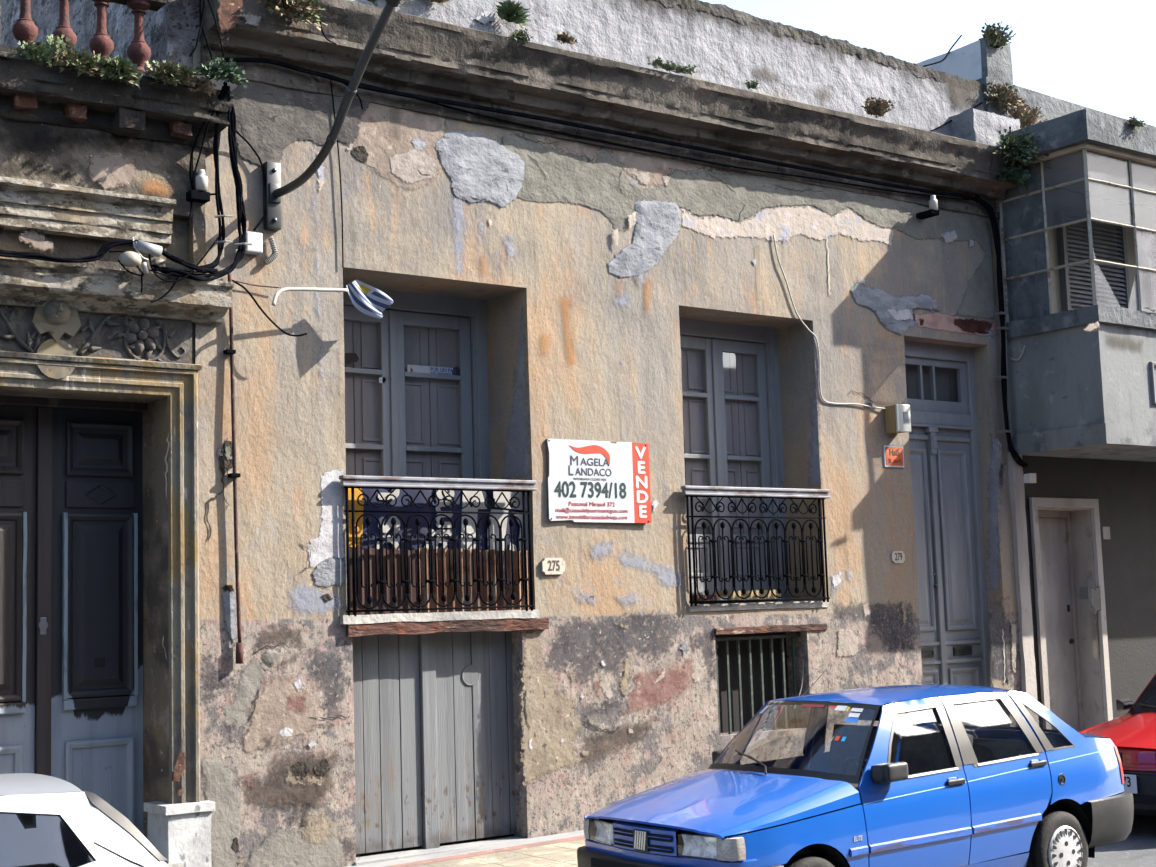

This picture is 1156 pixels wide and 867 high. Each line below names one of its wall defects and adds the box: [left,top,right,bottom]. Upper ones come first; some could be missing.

flaking render [347,103,447,190]
peeling [613,212,637,247]
peeling [681,206,894,245]
peeling [888,309,914,321]
flaking render [289,469,346,615]
spalling [221,584,237,643]
flaking render [202,625,350,752]
water stain [580,720,650,765]
spalling [286,759,330,786]
peeling [341,837,357,860]